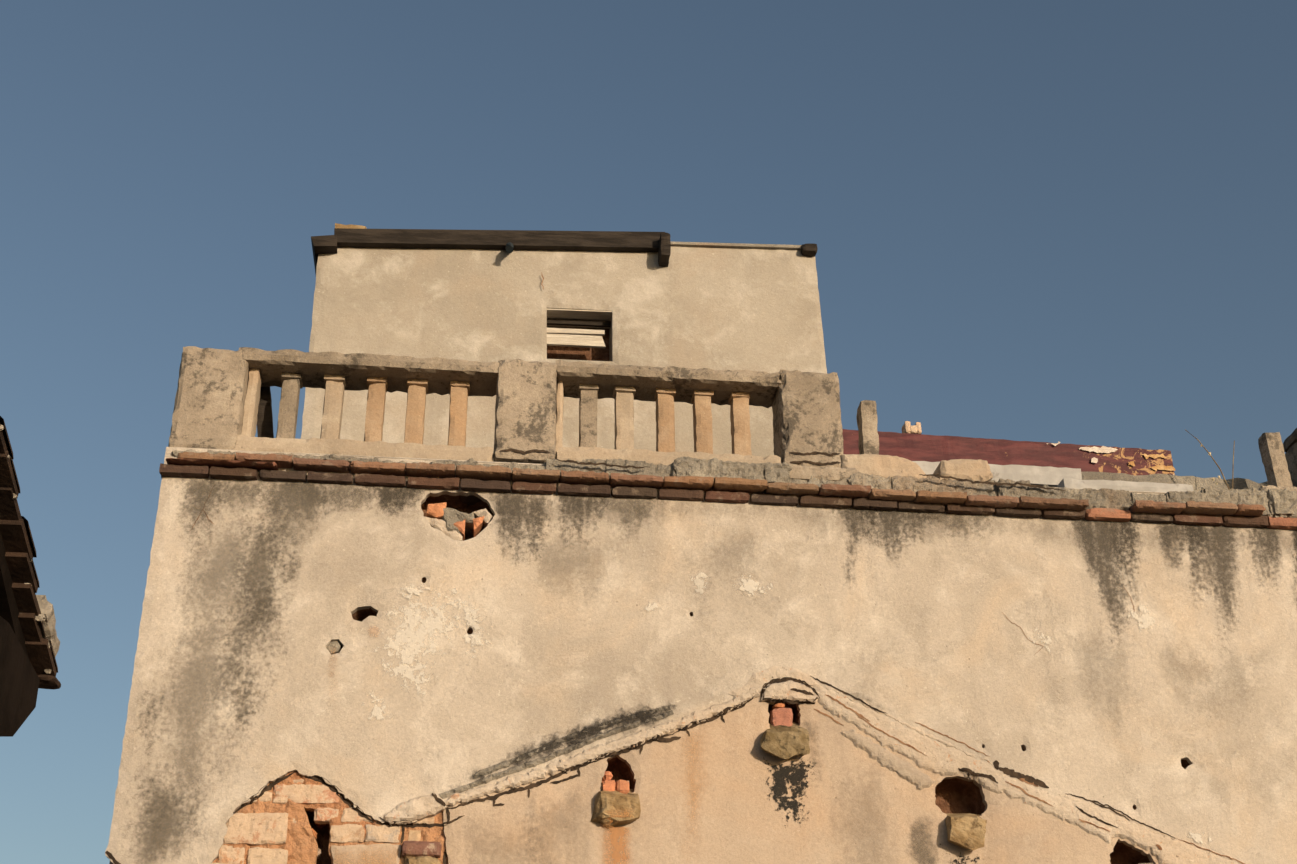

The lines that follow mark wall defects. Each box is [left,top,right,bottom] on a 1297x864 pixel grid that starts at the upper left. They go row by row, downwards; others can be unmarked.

leakage [188,481,363,646]
hole [421,495,494,541]
leakage [1075,518,1136,628]
leakage [1160,523,1280,617]
peeling [352,578,490,695]
crack [233,676,1245,864]
leakage [143,792,192,861]
flaking render [212,771,448,864]
corrosion [608,816,629,864]